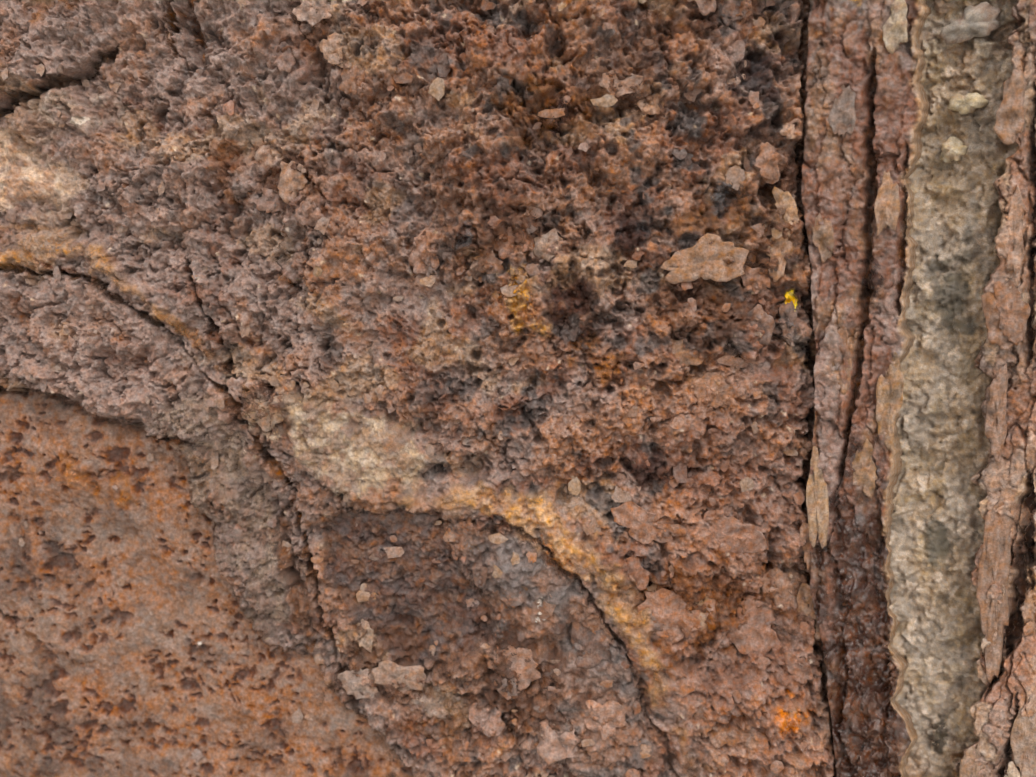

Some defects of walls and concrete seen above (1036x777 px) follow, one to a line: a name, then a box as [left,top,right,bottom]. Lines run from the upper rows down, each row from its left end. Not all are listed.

crack [0,44,120,118]
rust [0,225,122,290]
crack [184,256,243,414]
rust [208,139,271,203]
rust [506,268,551,337]
crack [794,0,835,777]
crack [835,44,909,500]
rust [950,0,1036,777]
crack [1024,79,1036,377]
crack [252,435,328,652]
rust [455,488,665,685]
rust [773,689,815,736]